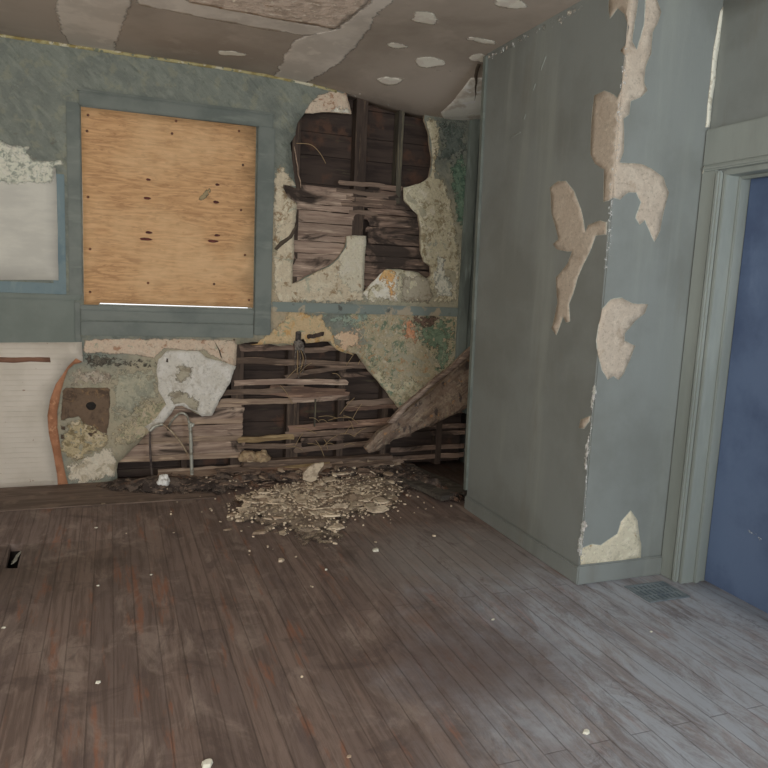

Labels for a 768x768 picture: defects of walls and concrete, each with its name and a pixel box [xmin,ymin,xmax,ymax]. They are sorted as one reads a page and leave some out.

spalling [272,91,466,304]
peeling [550,0,669,335]
spalling [60,314,466,483]
peeling [577,385,642,565]
peeling [596,297,648,380]